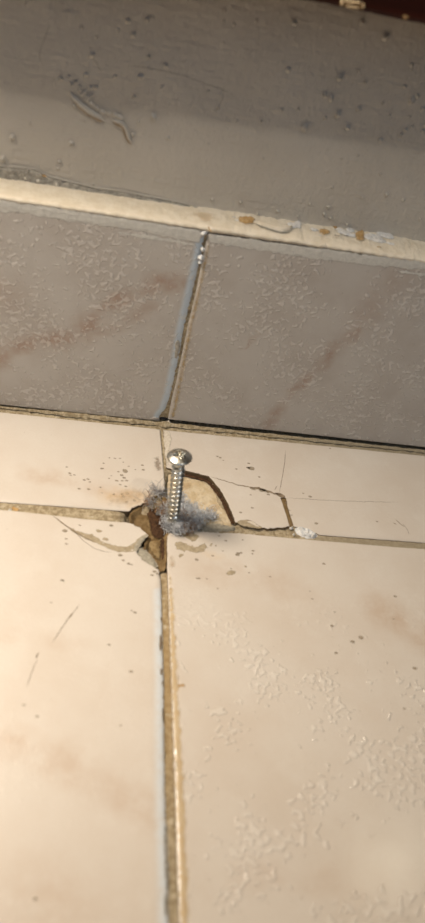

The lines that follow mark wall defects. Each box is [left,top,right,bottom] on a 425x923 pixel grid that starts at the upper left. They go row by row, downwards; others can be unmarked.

crack [52,515,105,552]
spalling [69,457,171,576]
spalling [182,473,262,556]